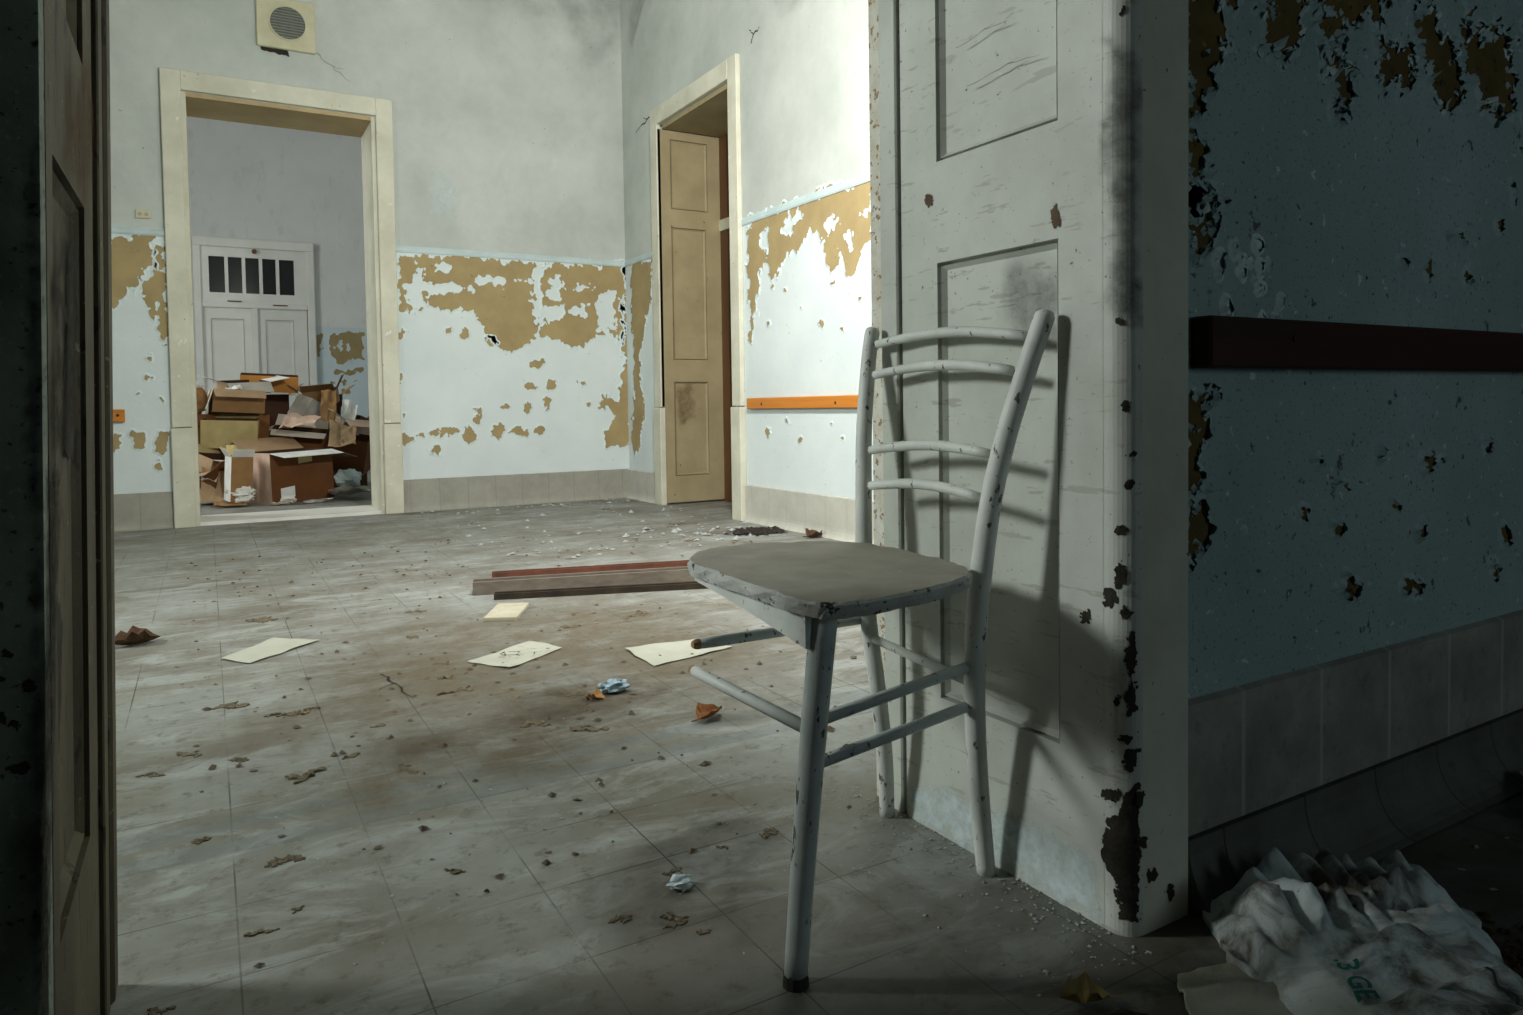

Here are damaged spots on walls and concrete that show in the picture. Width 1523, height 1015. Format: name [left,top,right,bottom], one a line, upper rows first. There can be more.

peeling [1188,0,1521,319]
peeling [111,233,169,405]
peeling [316,330,366,395]
peeling [396,253,653,458]
peeling [745,172,871,346]
spalling [1079,563,1139,717]
spalling [1101,735,1175,923]